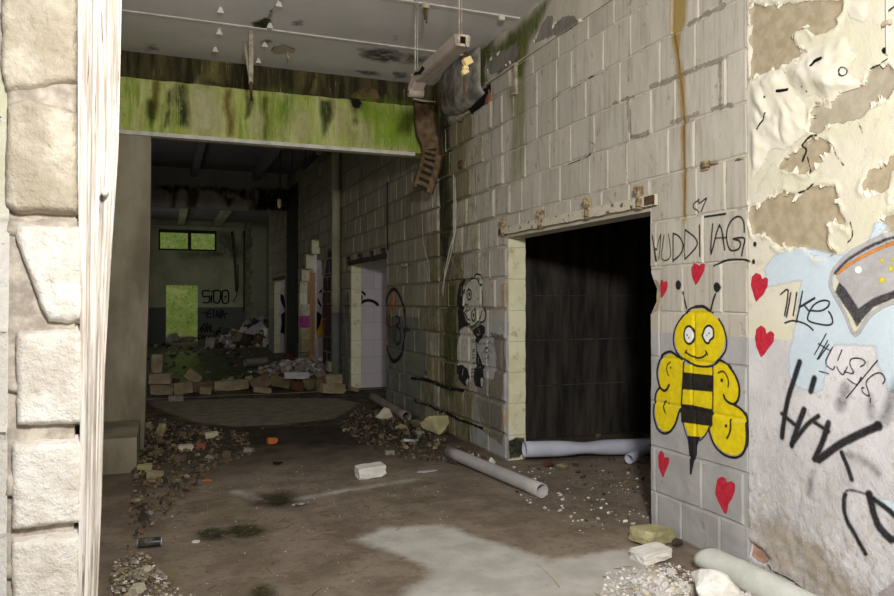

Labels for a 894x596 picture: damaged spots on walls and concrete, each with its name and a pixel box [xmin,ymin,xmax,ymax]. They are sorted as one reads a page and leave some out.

water stain [320,101,333,131]
water stain [366,50,425,62]
peeling [468,40,518,114]
peeling [533,15,583,43]
corrosion [672,0,687,216]
peeling [748,0,843,82]
peeling [749,61,894,257]
crack [410,371,484,441]